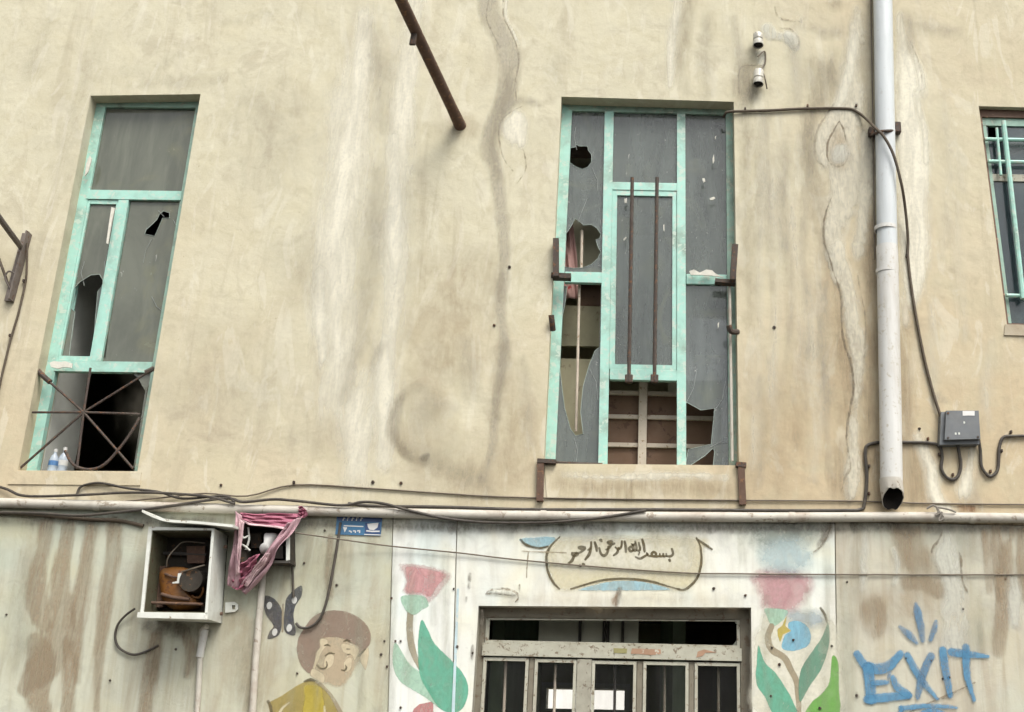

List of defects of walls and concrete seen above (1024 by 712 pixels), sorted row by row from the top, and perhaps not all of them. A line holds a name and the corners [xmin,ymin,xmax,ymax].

crack [498,93,527,159]